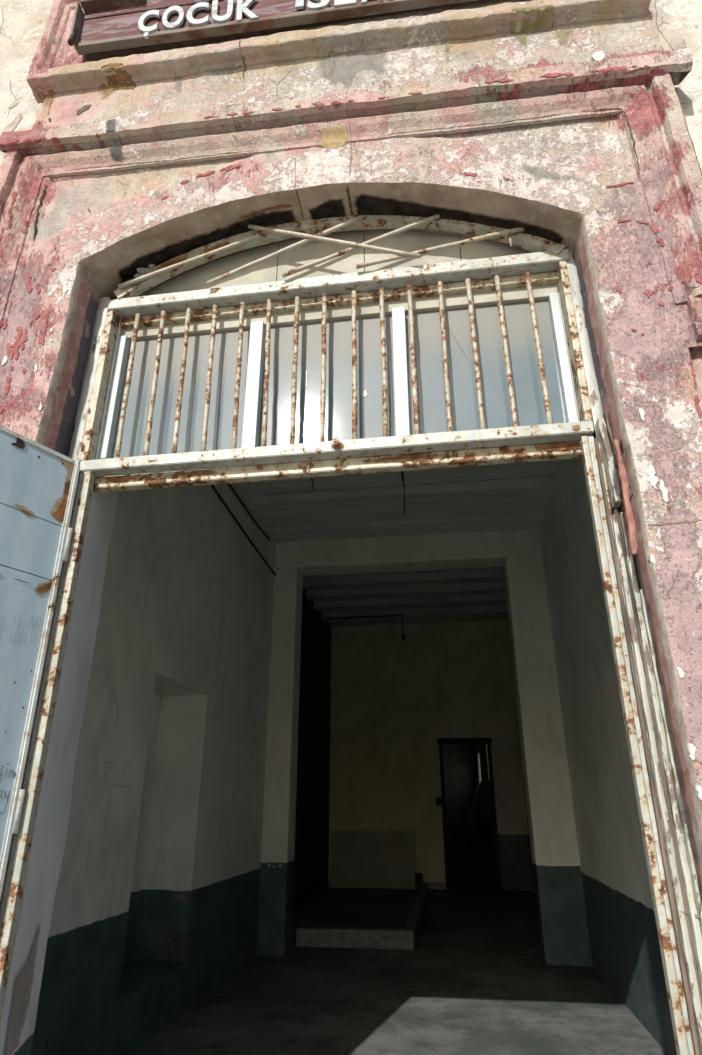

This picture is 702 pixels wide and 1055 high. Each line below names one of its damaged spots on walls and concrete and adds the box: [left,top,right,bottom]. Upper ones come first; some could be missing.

peeling [0,192,28,241]
peeling [618,219,665,246]
peeling [22,260,40,294]
peeling [0,301,53,413]
peeling [690,357,702,422]
corrosion [363,454,450,462]
peeling [613,439,637,555]
peeling [646,463,669,502]
peeling [687,743,696,760]